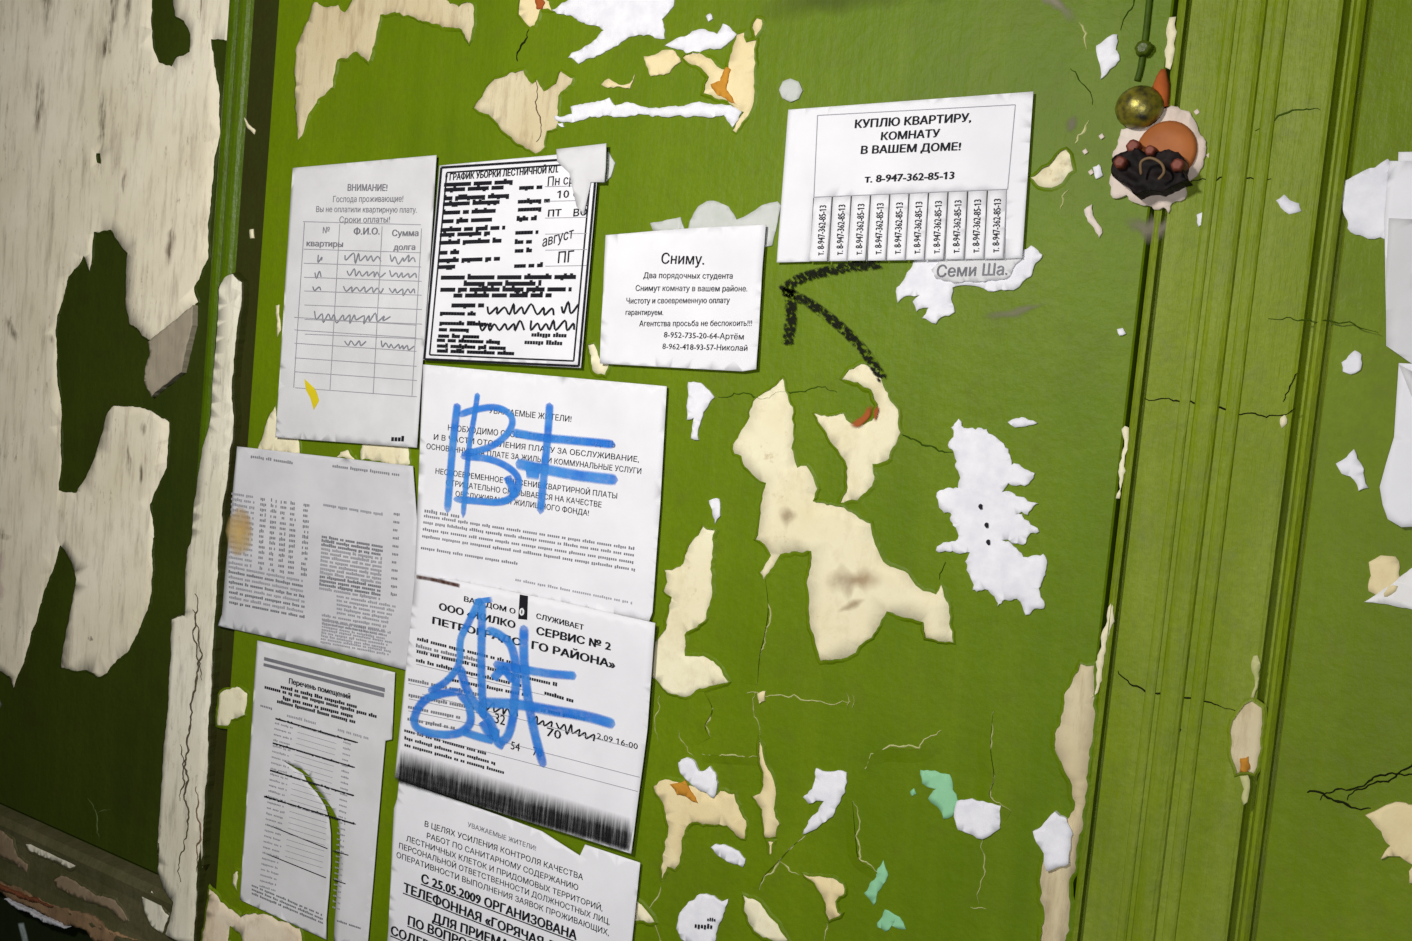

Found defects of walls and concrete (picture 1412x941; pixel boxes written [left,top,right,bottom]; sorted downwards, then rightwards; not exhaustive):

peeling [293,0,477,143]
peeling [472,67,576,156]
peeling [681,15,767,135]
peeling [0,0,229,690]
peeling [730,359,956,665]
peeling [0,272,305,941]
peeling [651,523,732,700]
peeling [652,734,782,887]
peeling [1035,604,1115,941]
peeling [1226,655,1267,805]
crack [1307,765,1412,810]
peeling [741,891,791,941]